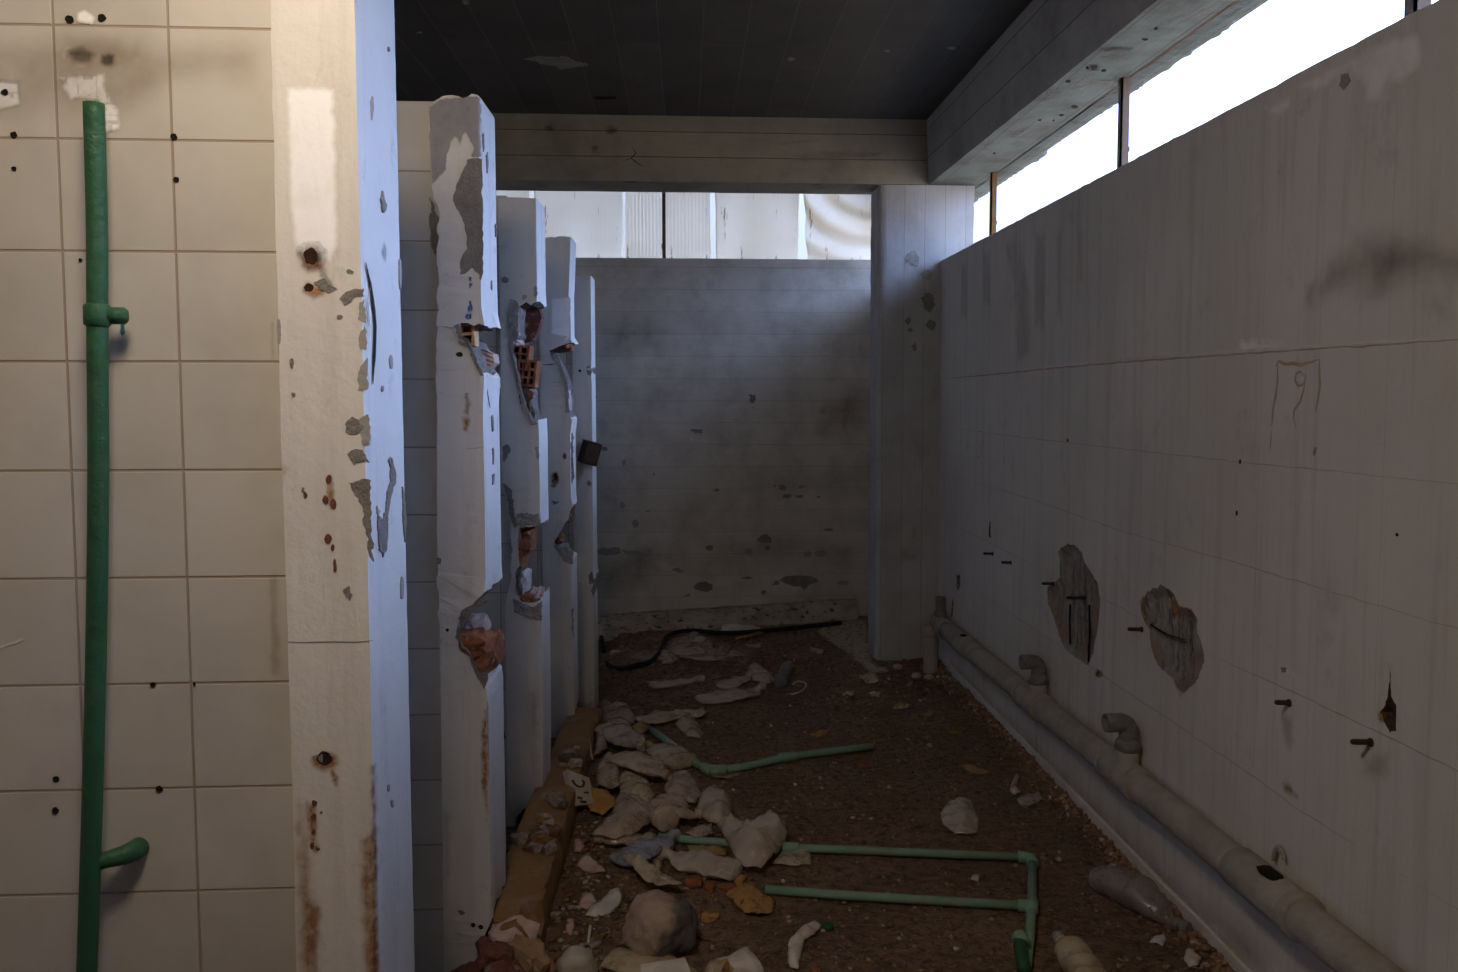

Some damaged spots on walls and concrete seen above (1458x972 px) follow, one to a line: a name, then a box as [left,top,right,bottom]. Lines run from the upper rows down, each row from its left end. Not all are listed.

flaking render [314,269,384,392]
flaking render [428,198,439,256]
flaking render [453,133,539,425]
peeling [550,344,576,413]
flaking render [345,414,407,562]
spalling [491,415,575,569]
spalling [455,600,505,689]
peeling [513,586,545,621]
spalling [1047,544,1100,665]
spalling [1141,584,1204,693]
spalling [1379,672,1396,732]
corrosion [309,800,323,851]